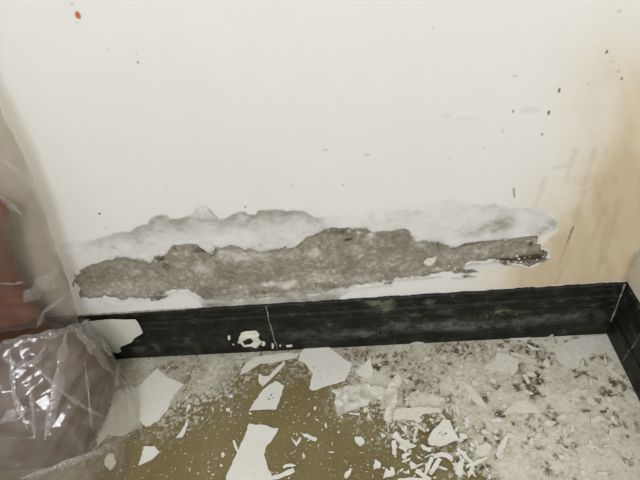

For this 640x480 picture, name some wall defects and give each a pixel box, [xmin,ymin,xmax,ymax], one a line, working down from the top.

spalling [56,195,559,309]
damp [437,0,640,302]